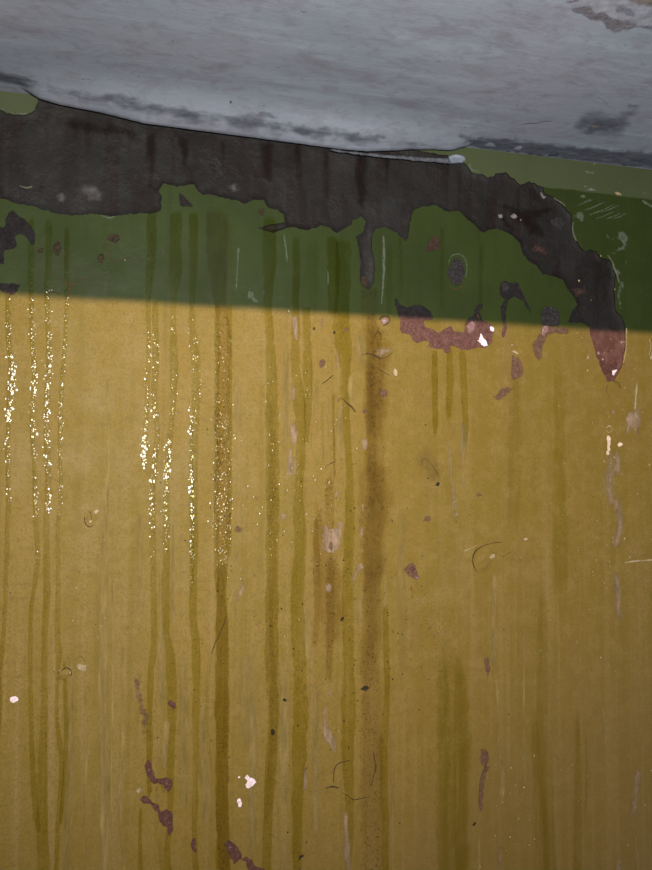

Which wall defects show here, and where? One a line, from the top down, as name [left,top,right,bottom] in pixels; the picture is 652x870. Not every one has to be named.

water stain [0,74,27,86]
water stain [133,106,198,118]
water stain [469,139,652,167]
spalling [0,99,643,490]